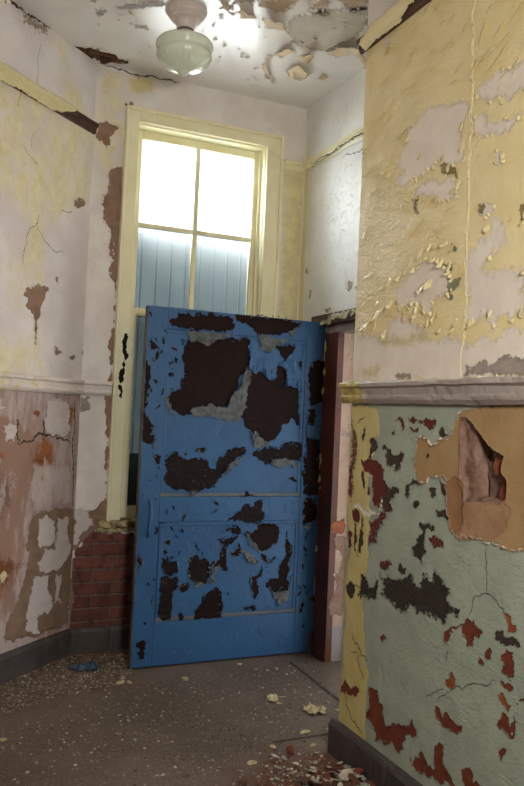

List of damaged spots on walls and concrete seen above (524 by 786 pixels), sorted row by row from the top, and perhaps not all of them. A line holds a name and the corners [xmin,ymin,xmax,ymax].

crack [105,65,176,83]
peeling [202,0,373,87]
spalling [24,277,59,345]
spalling [100,166,123,293]
peeling [319,201,524,382]
crack [16,401,76,502]
spalling [104,305,129,484]
flaking render [4,498,144,643]
spalling [329,405,524,648]
peeling [341,680,482,786]
crack [428,680,495,702]
peeling [478,611,524,739]